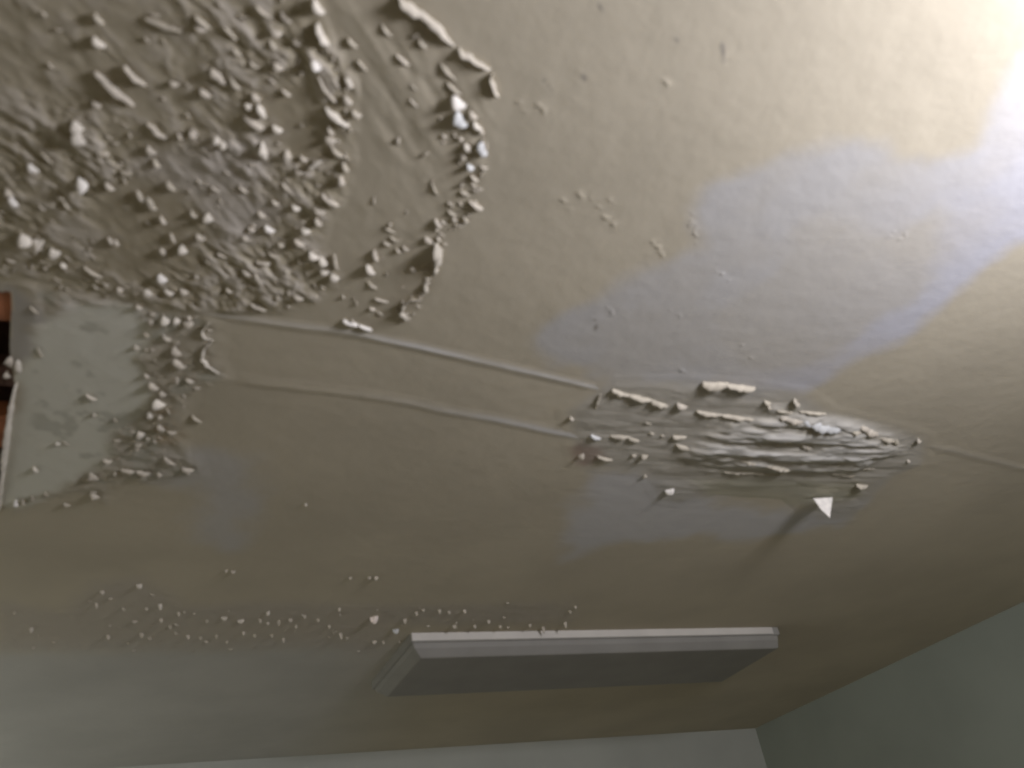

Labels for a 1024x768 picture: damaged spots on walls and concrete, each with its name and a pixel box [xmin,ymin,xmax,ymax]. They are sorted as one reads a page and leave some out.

peeling [0,0,517,521]
leakage [501,30,1024,394]
leakage [530,463,899,573]
flaking render [552,373,938,525]
peeling [0,566,597,663]